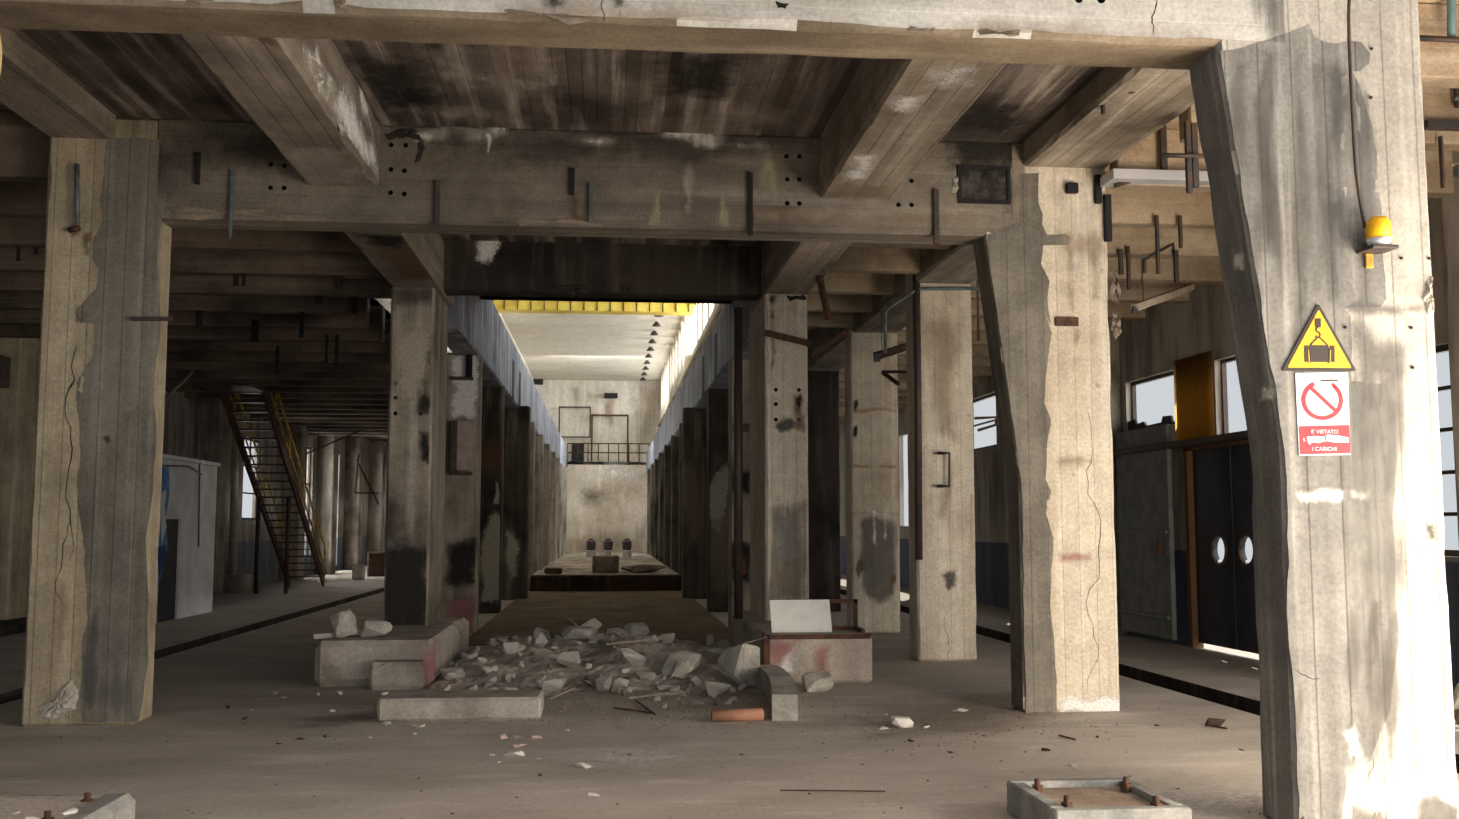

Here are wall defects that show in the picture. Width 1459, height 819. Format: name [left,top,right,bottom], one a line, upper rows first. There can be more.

leakage [669,52,735,98]
crack [55,291,88,605]
leakage [861,510,894,601]
crack [1086,410,1101,684]
leakage [1421,795,1457,819]